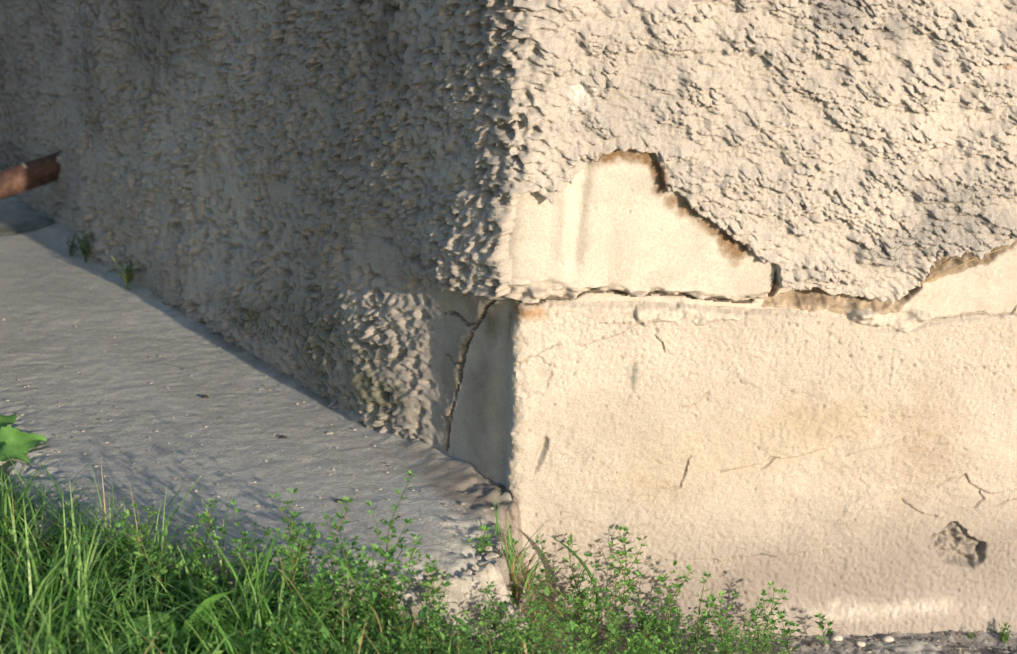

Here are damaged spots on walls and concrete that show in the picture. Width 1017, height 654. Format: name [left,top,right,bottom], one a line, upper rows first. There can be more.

flaking render [504,149,849,327]
flaking render [903,243,1017,317]
crack [931,305,1017,321]
crack [442,300,496,451]
peeling [513,354,554,399]
spalling [531,435,549,477]
crack [719,435,904,474]
crack [901,498,942,519]
crack [936,473,1017,508]
hole [928,521,988,571]